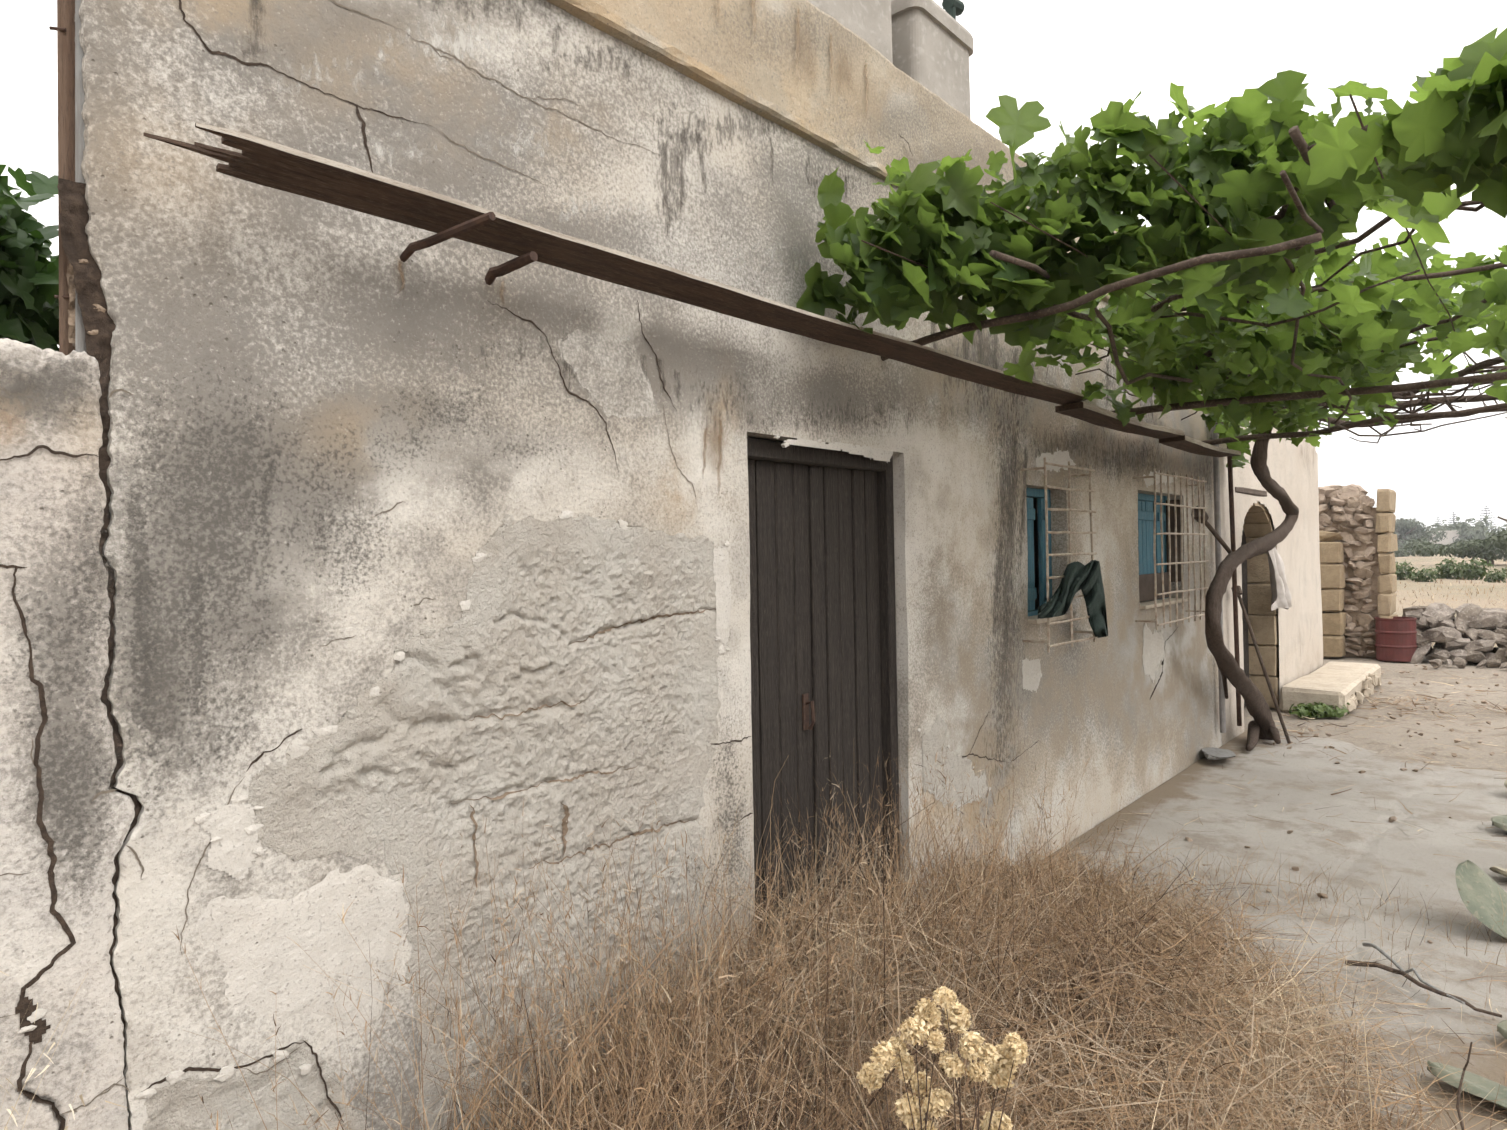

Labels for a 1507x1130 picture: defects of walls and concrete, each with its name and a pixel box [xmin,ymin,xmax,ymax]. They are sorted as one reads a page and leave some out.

crack [179,0,544,185]
crack [331,0,659,155]
crack [487,300,619,473]
crack [637,300,697,505]
crack [0,178,344,1130]
flaking render [194,511,733,1130]
flaking render [135,1038,374,1130]